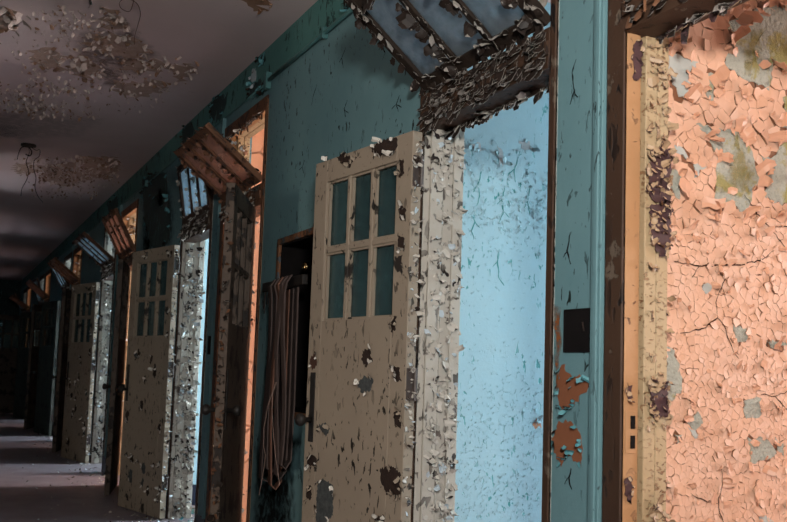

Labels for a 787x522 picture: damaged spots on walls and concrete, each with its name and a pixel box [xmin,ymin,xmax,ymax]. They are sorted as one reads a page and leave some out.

peeling [242,0,273,14]
peeling [622,0,666,29]
peeling [339,0,590,522]
peeling [11,91,265,522]
spalling [733,324,752,342]
spalling [625,346,705,443]
spalling [743,397,762,419]
spalling [748,436,784,473]